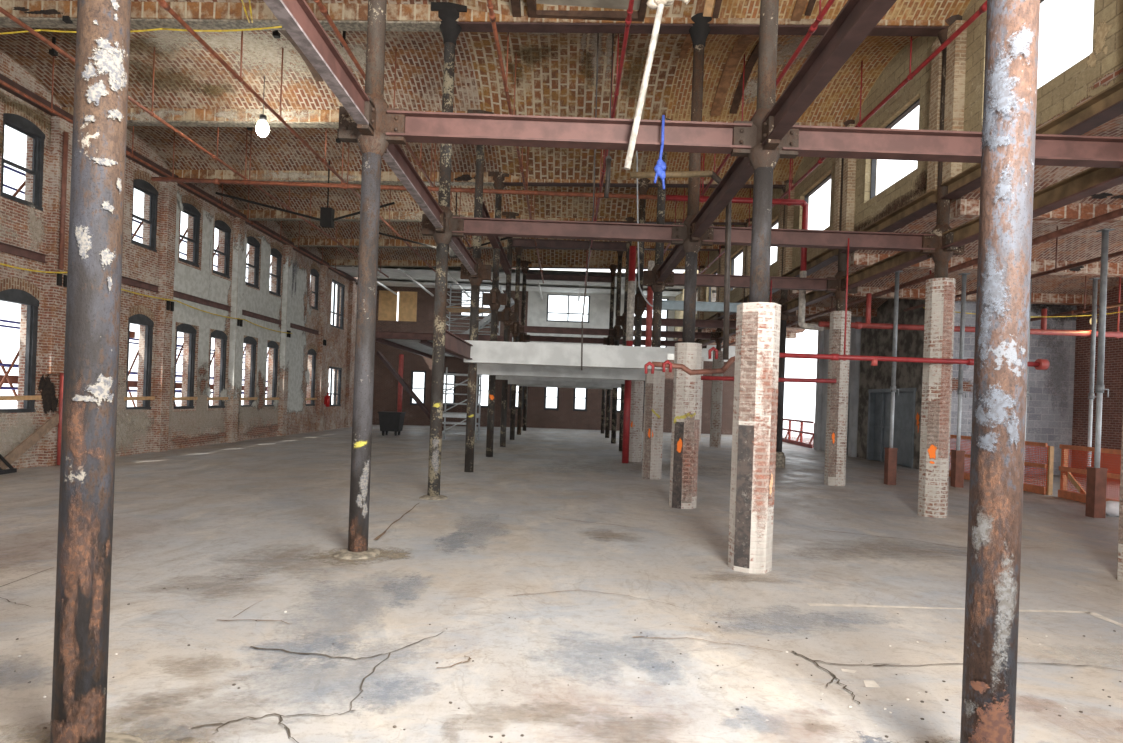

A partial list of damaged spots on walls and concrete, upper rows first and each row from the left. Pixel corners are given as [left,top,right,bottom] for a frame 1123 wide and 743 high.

peeling [81,20,128,122]
peeling [980,23,1034,152]
peeling [89,157,122,214]
peeling [75,225,116,291]
spalling [38,374,58,414]
peeling [73,373,114,406]
peeling [927,285,1020,458]
peeling [356,459,370,518]
rust [50,495,110,743]
crack [191,605,441,743]
crack [686,637,963,704]
rust [966,680,1015,743]